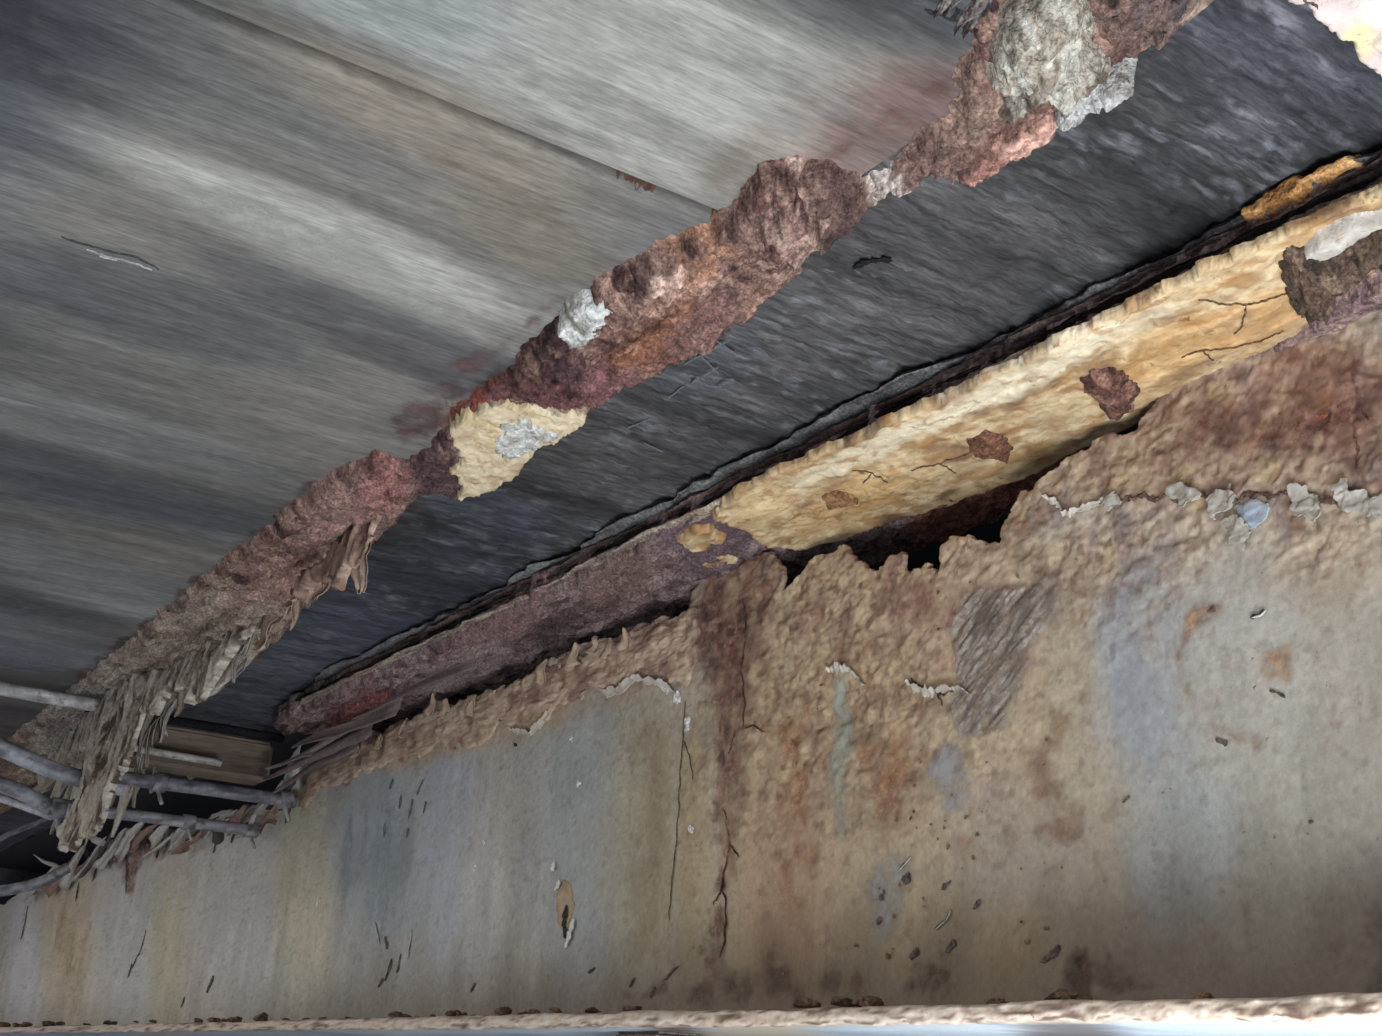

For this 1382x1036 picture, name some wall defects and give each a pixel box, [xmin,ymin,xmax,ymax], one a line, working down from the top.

spalling [932,0,1114,126]
peeling [448,399,589,501]
rust [822,490,858,510]
peeling [675,183,1382,568]
peeling [75,687,187,901]
peeling [285,606,701,838]
spalling [550,861,575,948]
crack [668,701,693,920]
rust [688,590,752,856]
crack [713,808,739,958]
crack [728,598,765,754]
peeling [904,679,970,698]